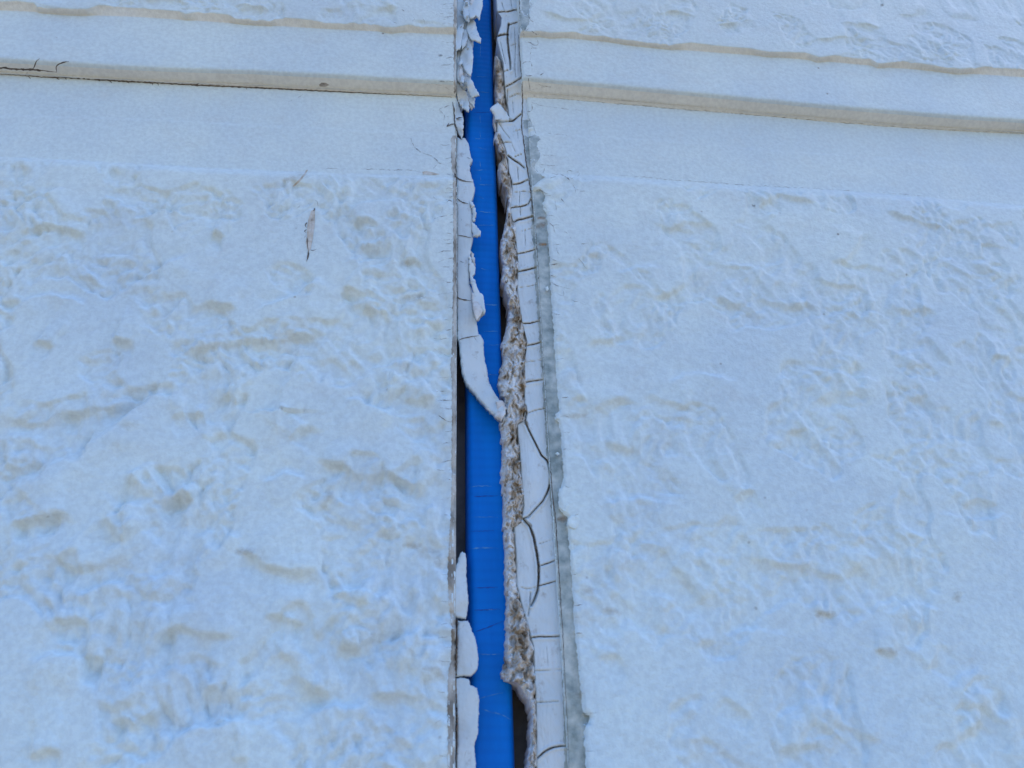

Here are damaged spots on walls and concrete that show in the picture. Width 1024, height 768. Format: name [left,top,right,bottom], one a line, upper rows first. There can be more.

peeling [447,0,483,768]
crack [496,0,581,761]